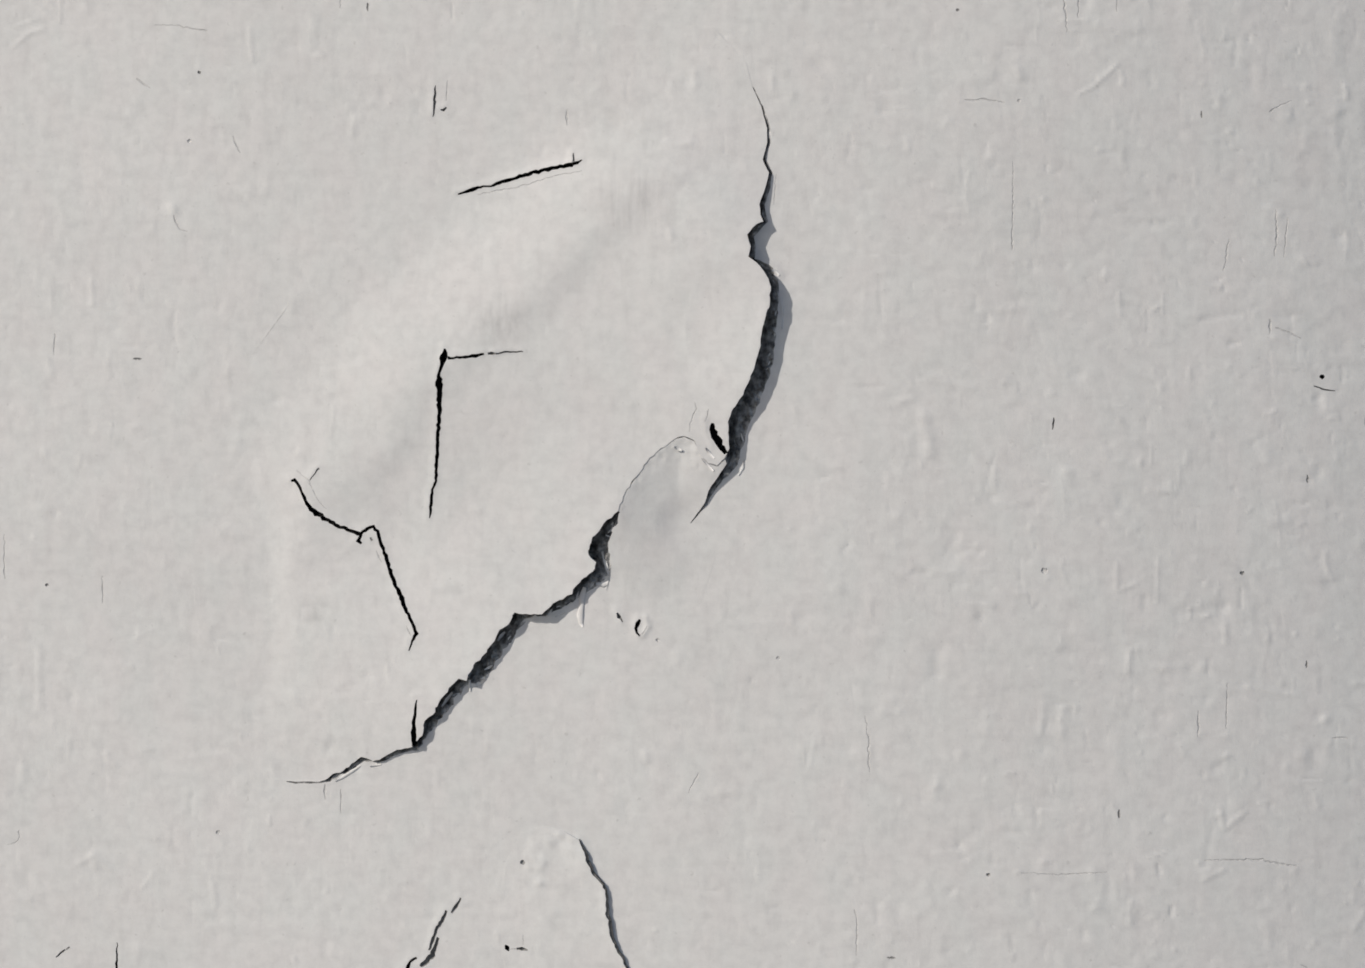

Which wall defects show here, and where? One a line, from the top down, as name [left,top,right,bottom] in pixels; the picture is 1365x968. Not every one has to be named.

crack [458,109,582,195]
crack [429,349,523,518]
crack [291,468,419,651]
spalling [521,437,745,642]
crack [406,898,461,968]